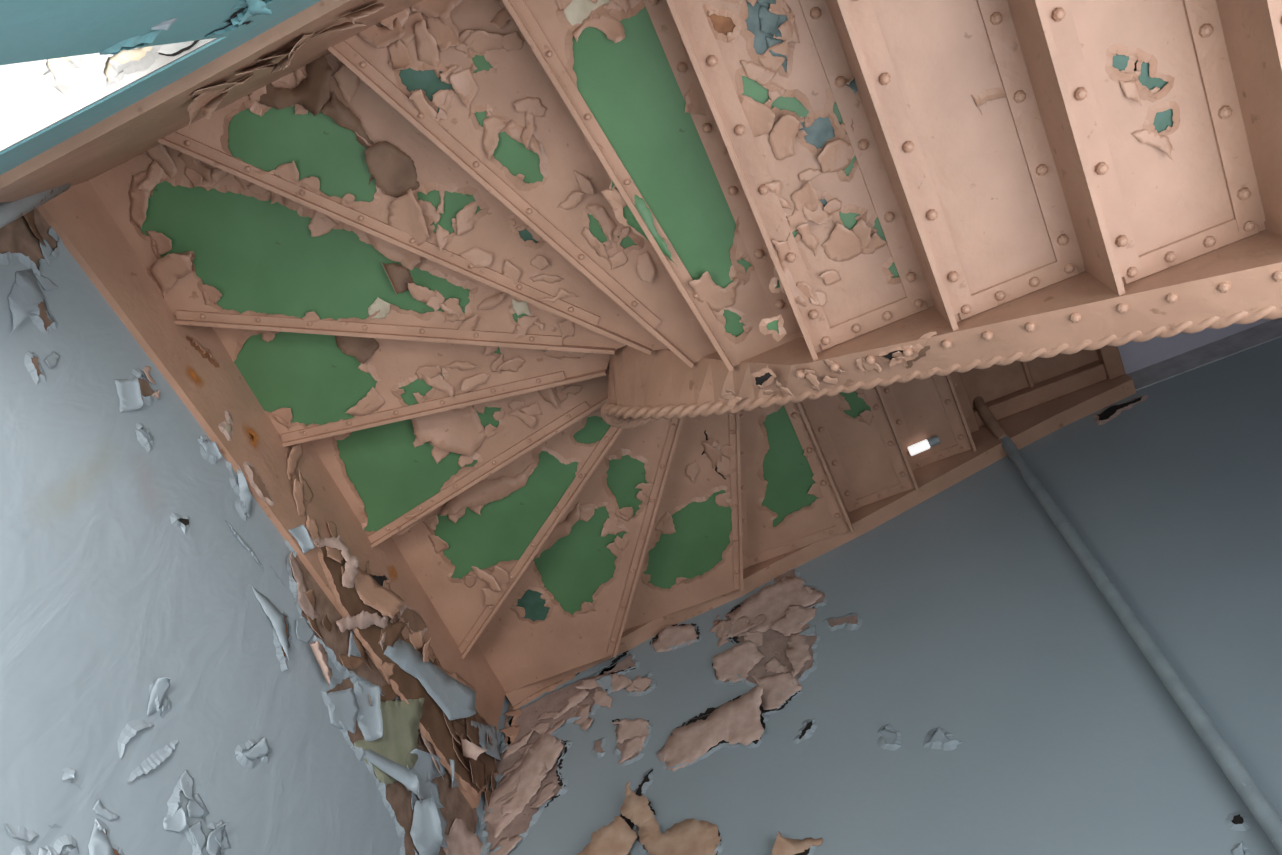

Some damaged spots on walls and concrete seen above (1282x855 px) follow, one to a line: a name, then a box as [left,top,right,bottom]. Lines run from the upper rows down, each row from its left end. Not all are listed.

peeling [703,0,901,307]
peeling [1105,43,1181,160]
peeling [0,208,64,336]
peeling [24,351,60,385]
peeling [115,366,160,453]
peeling [128,0,863,855]
peeling [801,345,914,425]
peeling [11,798,125,855]